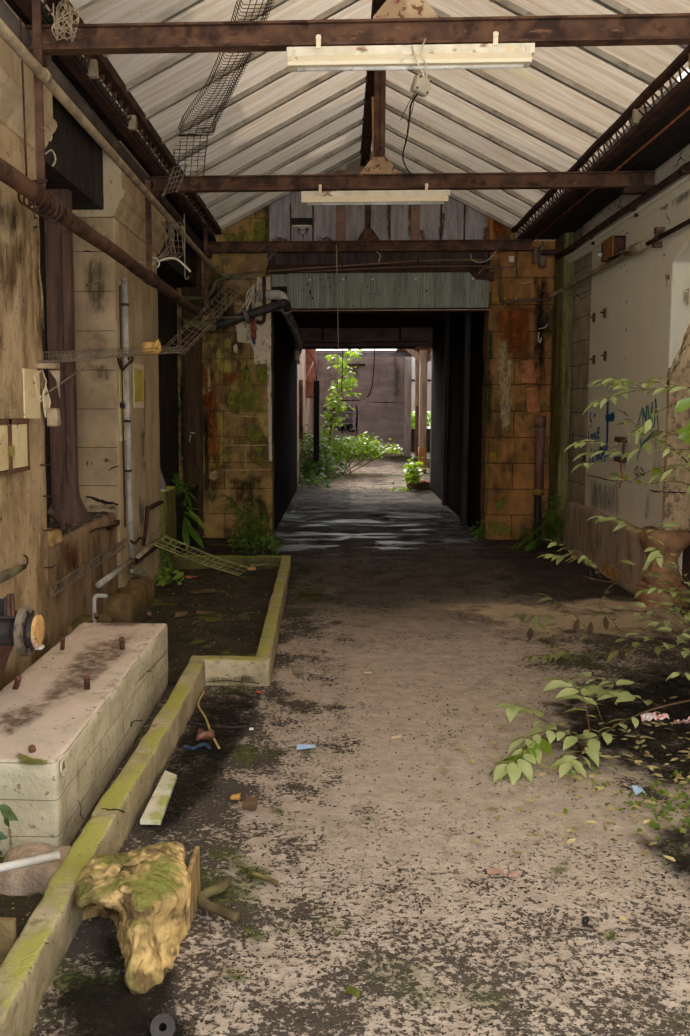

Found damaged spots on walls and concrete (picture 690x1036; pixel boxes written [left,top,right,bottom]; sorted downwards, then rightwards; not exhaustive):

damp [0,202,43,347]
damp [486,331,512,430]